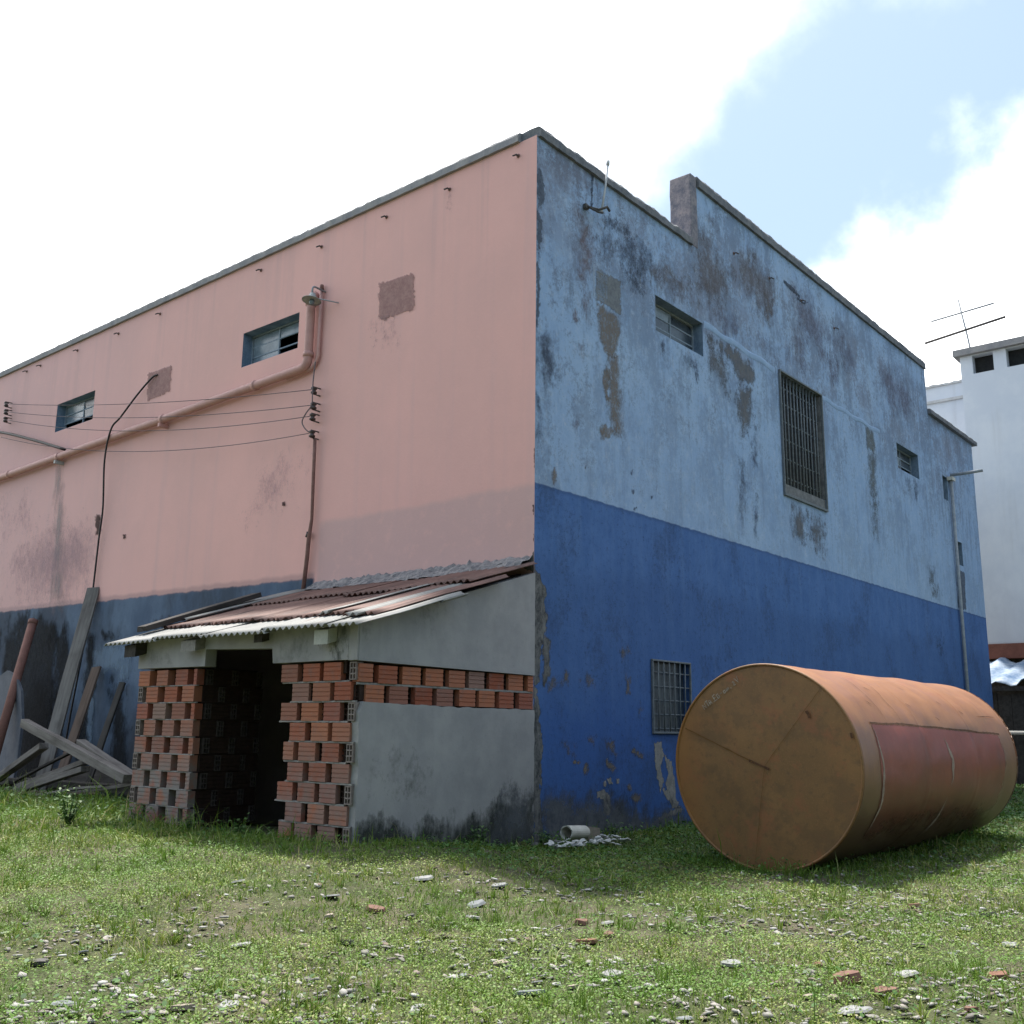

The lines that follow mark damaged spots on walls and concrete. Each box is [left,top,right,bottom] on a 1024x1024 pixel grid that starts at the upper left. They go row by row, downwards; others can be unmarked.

flaking render [378,273,415,320]
flaking render [595,270,621,315]
water stain [866,428,876,530]
water stain [0,613,69,778]
water stain [78,631,130,742]
water stain [108,693,126,765]
spalling [524,538,593,839]
water stain [357,788,692,849]
peeling [631,742,683,819]